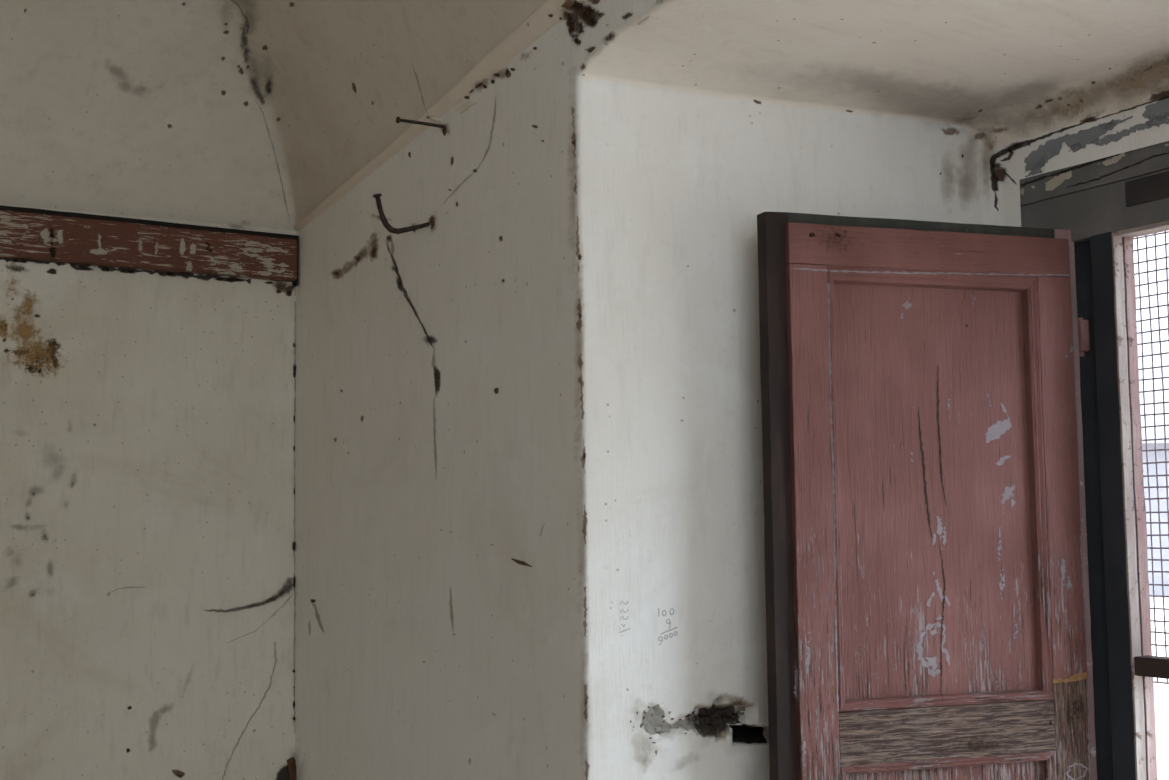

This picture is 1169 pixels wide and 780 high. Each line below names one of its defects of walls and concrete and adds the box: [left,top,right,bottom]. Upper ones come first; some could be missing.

damp [1036,58,1169,116]
peeling [995,98,1169,195]
rust [0,282,64,376]
flaking render [0,258,251,284]
flaking render [265,281,294,296]
crack [385,239,440,390]
spalling [630,697,767,754]